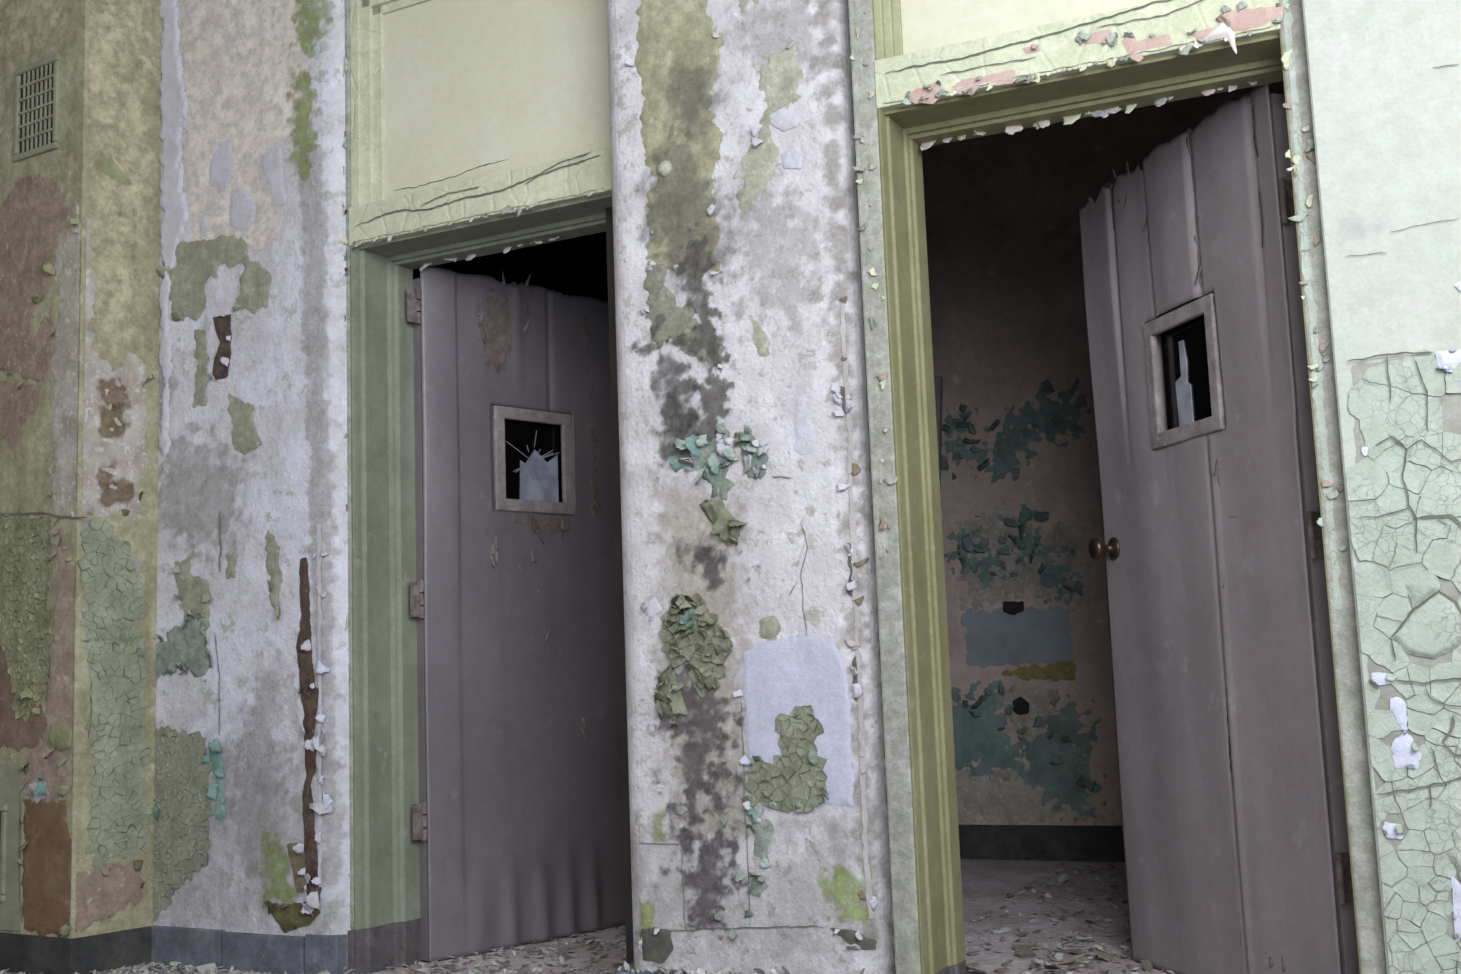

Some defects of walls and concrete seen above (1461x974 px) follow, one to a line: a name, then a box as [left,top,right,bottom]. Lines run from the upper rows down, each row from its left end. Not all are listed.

peeling [0,0,272,933]
peeling [624,0,725,372]
leakage [632,145,735,473]
leakage [655,489,756,940]
peeling [641,0,1348,950]
crack [1346,348,1461,974]
peeling [1435,349,1461,388]